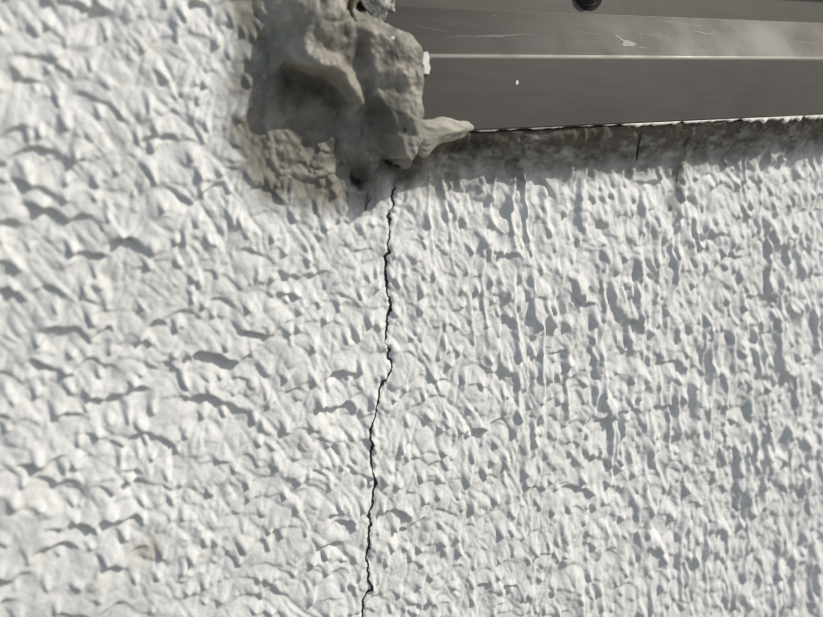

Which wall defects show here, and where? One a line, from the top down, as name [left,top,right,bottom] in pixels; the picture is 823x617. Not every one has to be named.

crack [361,182,396,617]